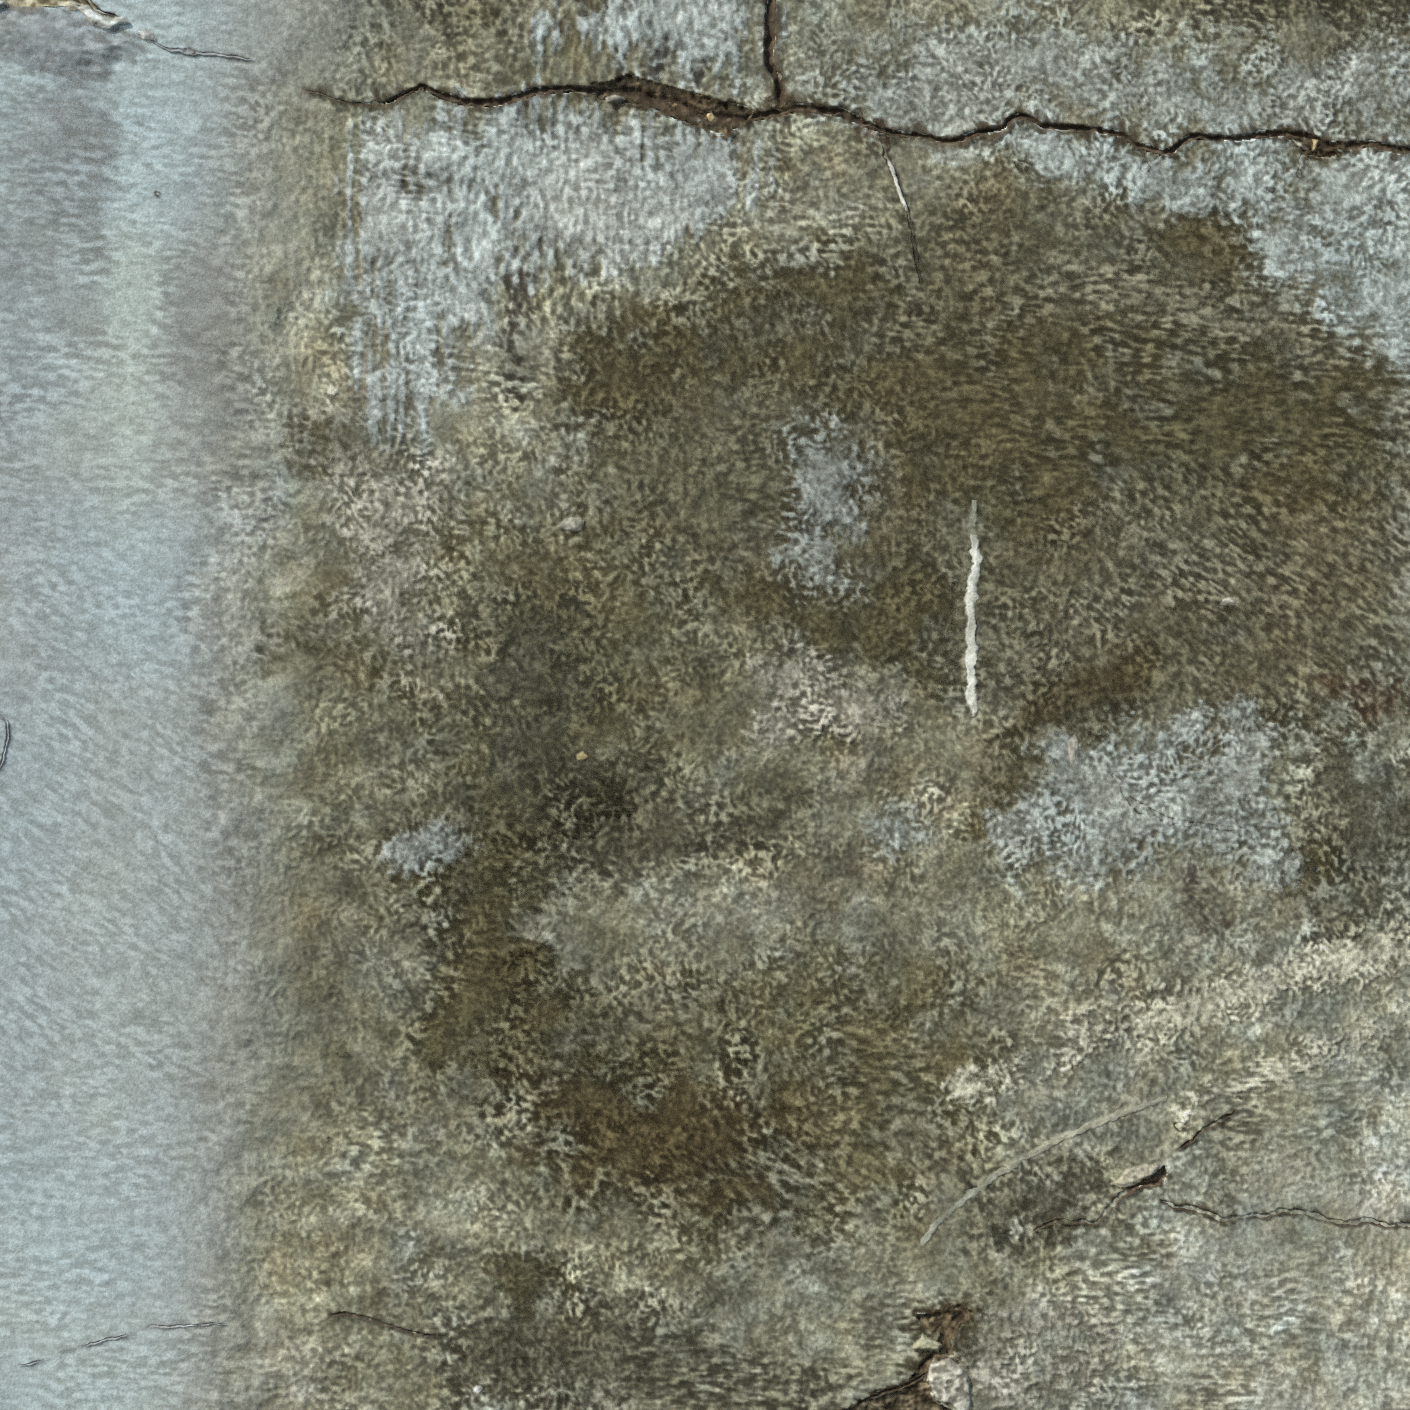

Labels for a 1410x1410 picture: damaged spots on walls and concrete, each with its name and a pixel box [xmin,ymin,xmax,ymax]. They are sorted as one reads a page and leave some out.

spalling [0,0,155,40]
crack [136,33,251,60]
crack [301,0,1410,286]
crack [0,714,9,766]
leakage [393,145,1410,1255]
crack [1033,1109,1410,1231]
crack [872,1371,928,1398]
spalling [842,1303,980,1410]